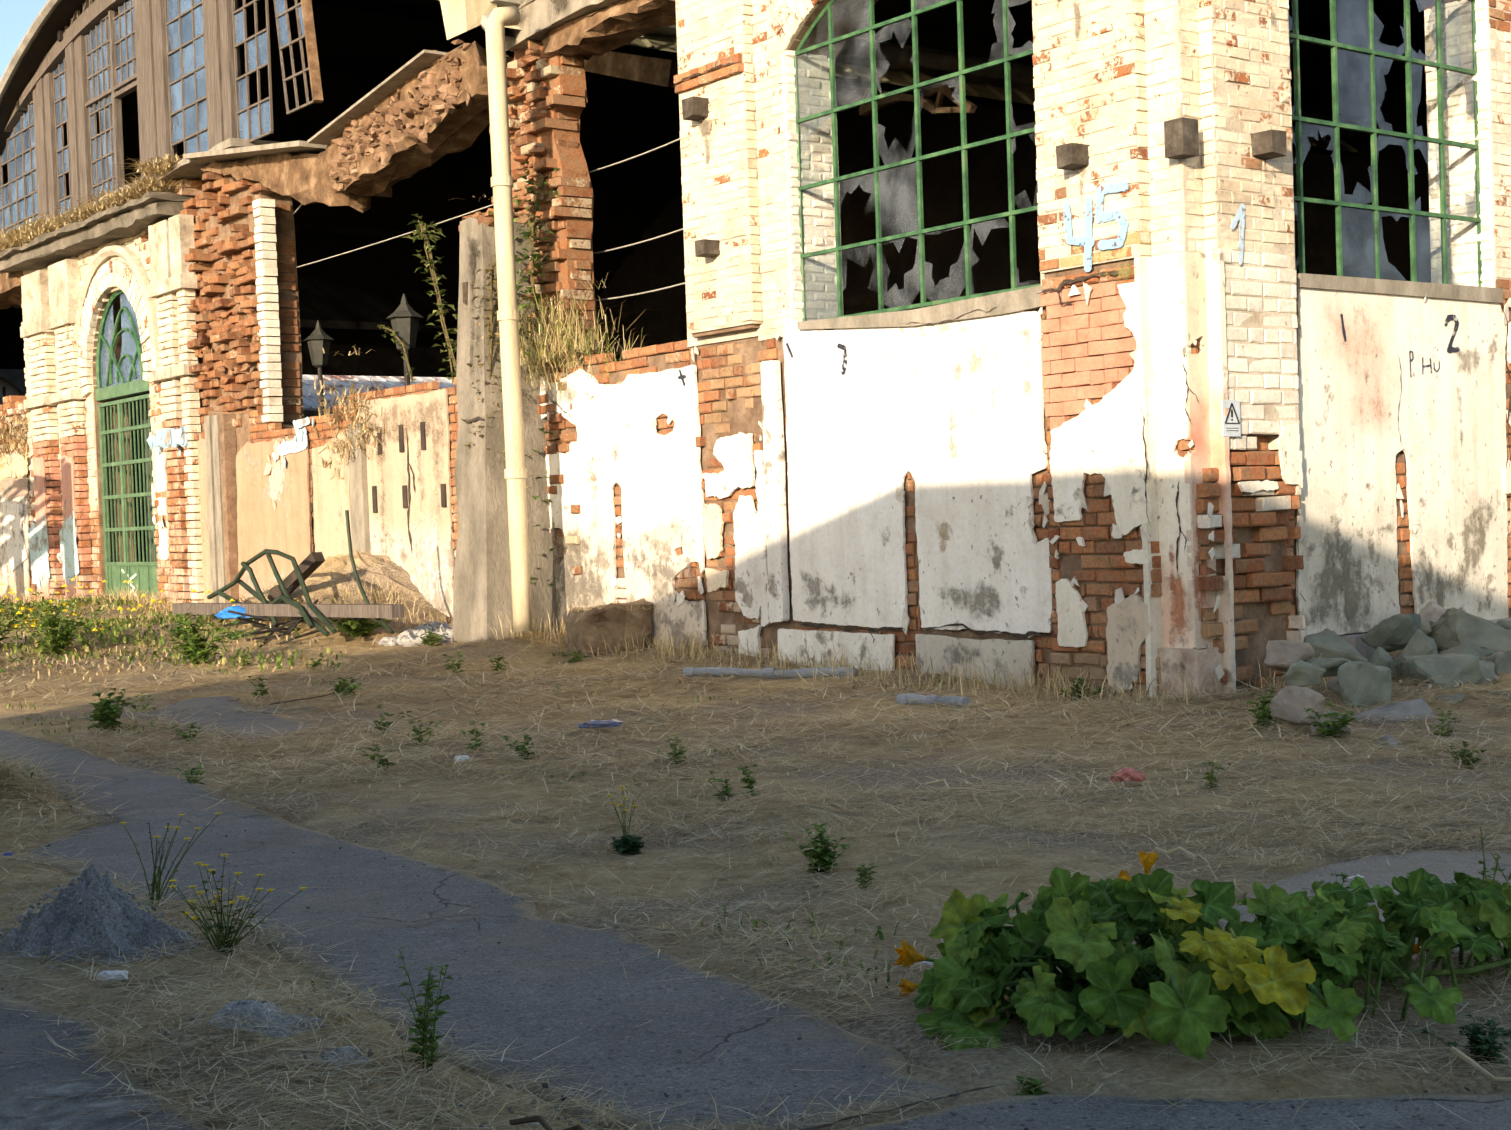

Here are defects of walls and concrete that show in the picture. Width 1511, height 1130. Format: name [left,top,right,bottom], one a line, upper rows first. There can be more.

water stain [1458,350,1480,370]
spalling [1502,298,1511,468]
peeling [0,444,79,589]
spalling [672,333,780,658]
water stain [802,574,850,608]
water stain [937,523,948,551]
water stain [942,583,999,616]
spalling [1026,281,1162,697]
spalling [1172,437,1308,689]
water stain [1310,521,1370,622]
water stain [1419,506,1492,606]